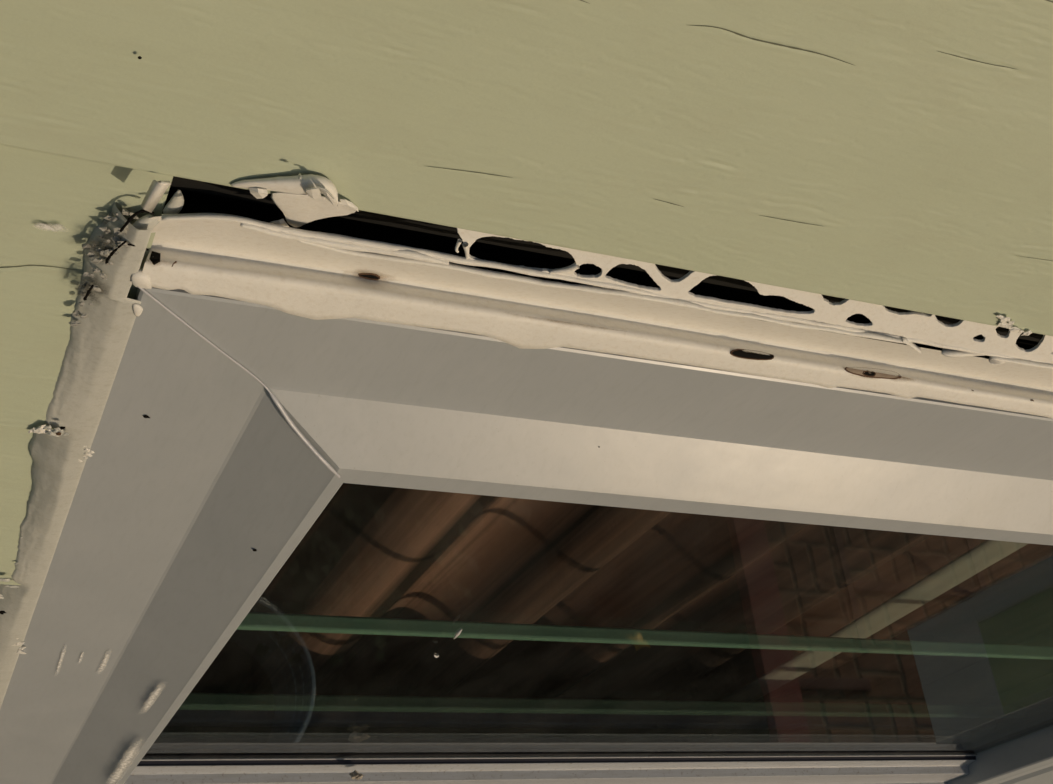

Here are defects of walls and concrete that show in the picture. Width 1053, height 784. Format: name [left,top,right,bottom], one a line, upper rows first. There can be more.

peeling [133,180,184,230]
peeling [249,188,268,199]
peeling [306,186,359,212]
peeling [996,314,1033,336]
peeling [941,348,1006,365]